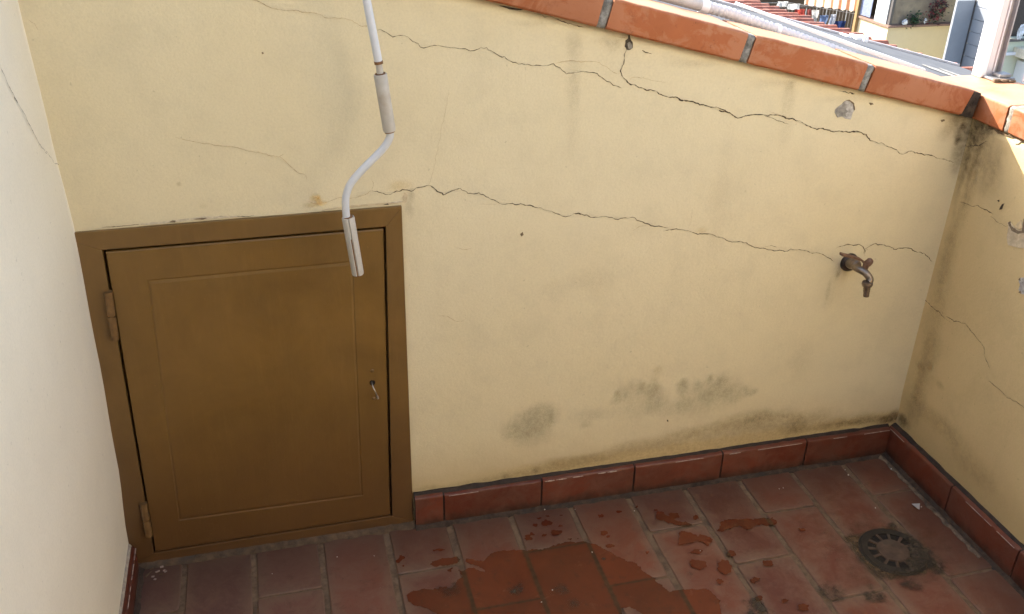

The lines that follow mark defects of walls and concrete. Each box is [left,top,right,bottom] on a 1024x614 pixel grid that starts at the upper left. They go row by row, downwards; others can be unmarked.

crack [175,94,931,261]
crack [254,0,986,163]
peeling [835,100,855,120]
damp [407,509,777,614]